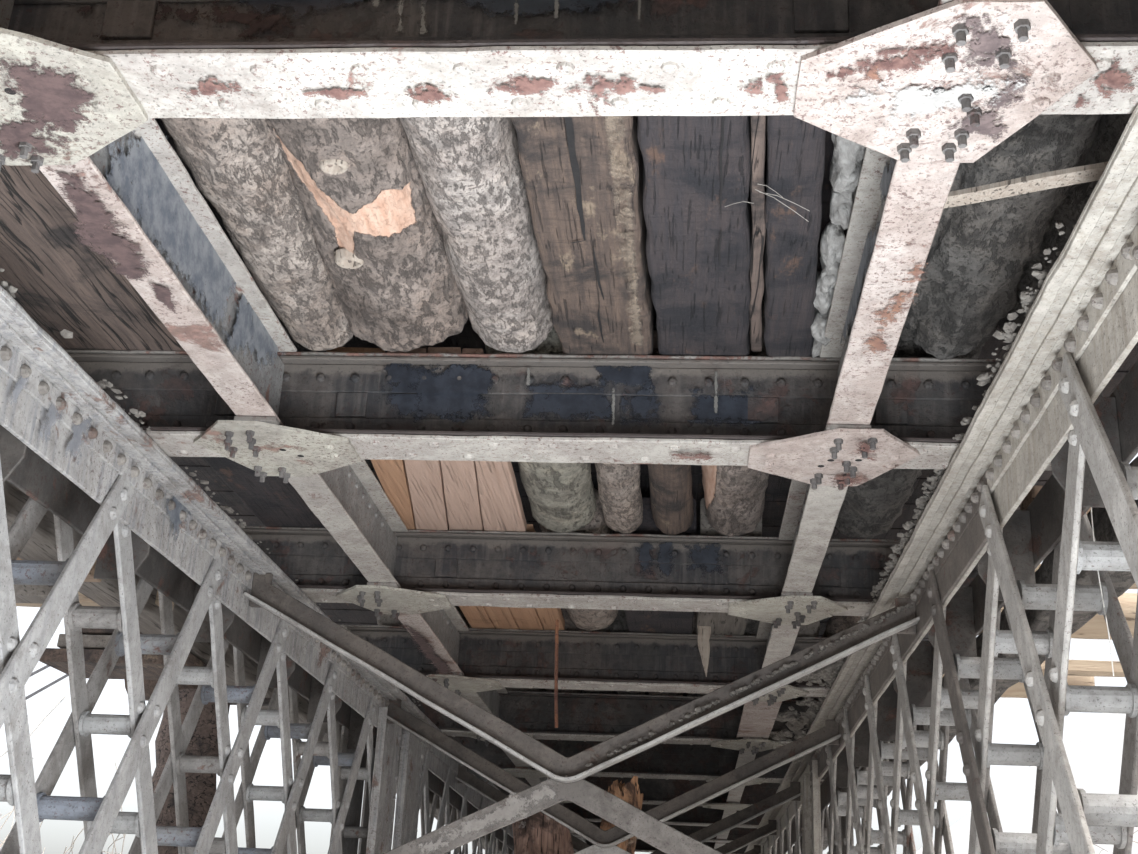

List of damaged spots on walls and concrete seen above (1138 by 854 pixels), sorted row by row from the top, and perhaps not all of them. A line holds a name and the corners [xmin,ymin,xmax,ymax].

peeling [461,0,635,19]
corrosion [297,87,369,101]
corrosion [405,82,460,107]
corrosion [488,70,666,116]
corrosion [826,12,1035,142]
corrosion [1072,60,1138,108]
corrosion [0,55,176,313]
peeling [381,363,495,423]
peeling [687,385,760,430]
peeling [635,542,723,577]